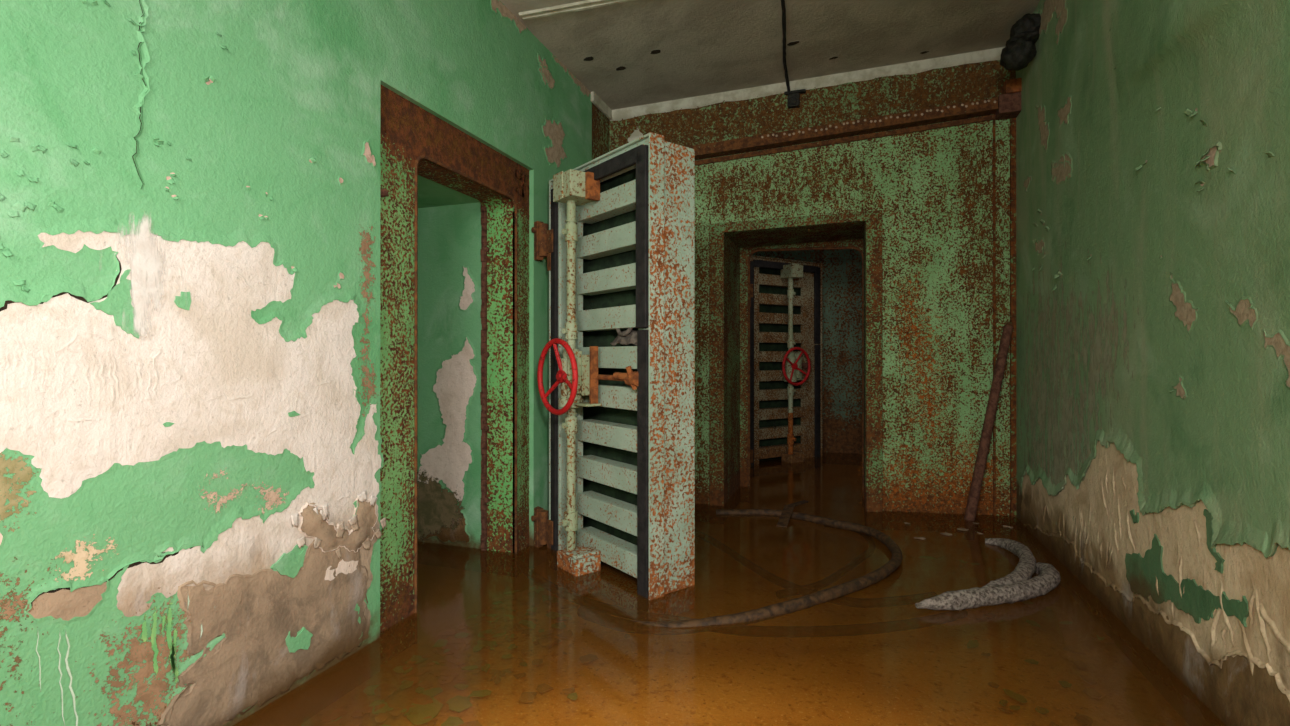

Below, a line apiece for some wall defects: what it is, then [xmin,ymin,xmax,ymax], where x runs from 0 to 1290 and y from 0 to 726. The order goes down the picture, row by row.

crack [132,0,150,190]
peeling [361,139,377,168]
peeling [542,117,567,168]
peeling [0,193,387,726]
rust [380,158,424,656]
peeling [417,335,479,545]
rust [516,185,530,558]
rust [609,62,1010,535]
peeling [1169,272,1200,333]
peeling [1225,296,1290,389]
peeling [1003,427,1290,726]